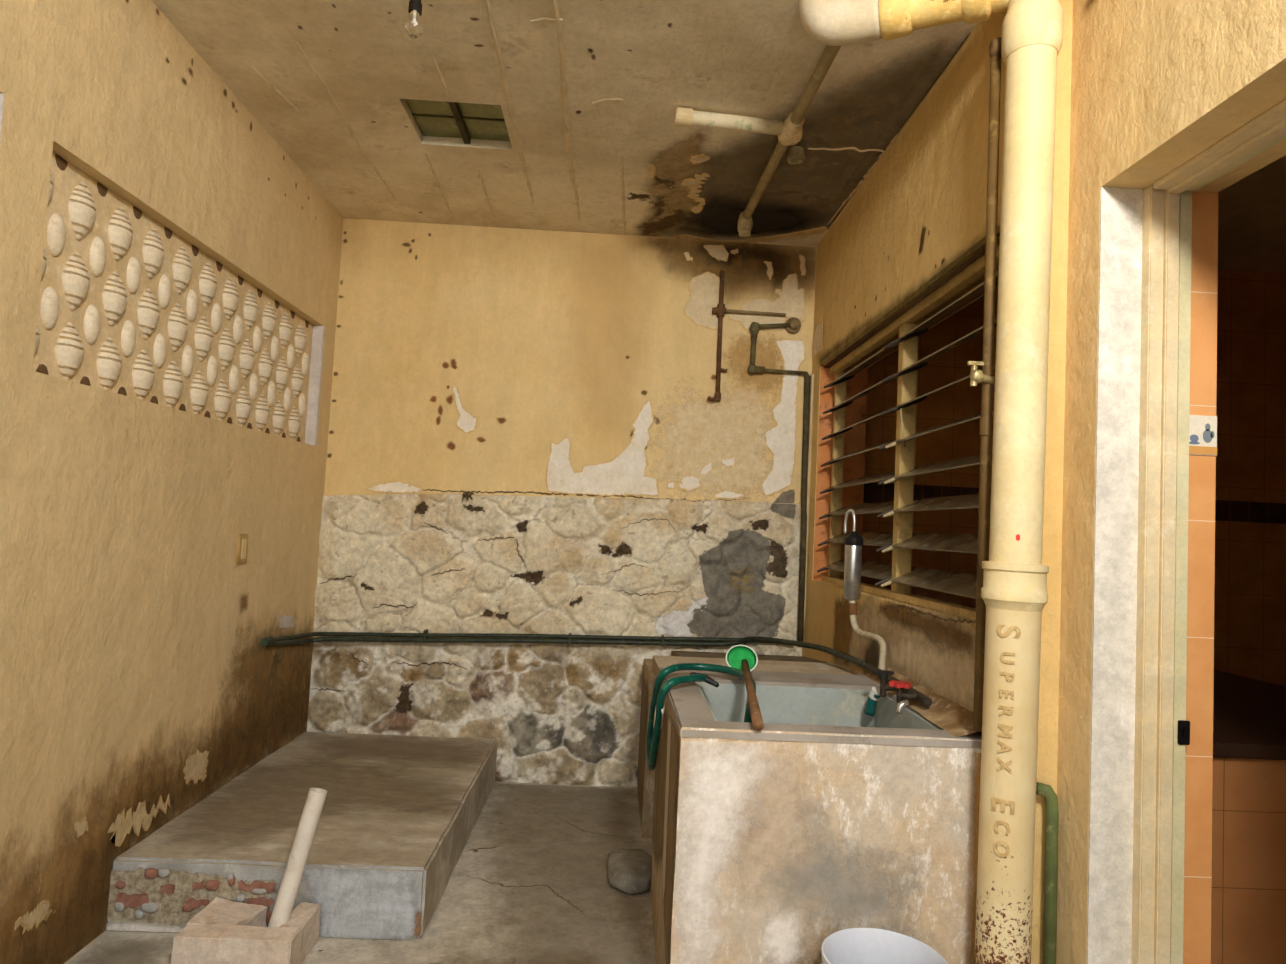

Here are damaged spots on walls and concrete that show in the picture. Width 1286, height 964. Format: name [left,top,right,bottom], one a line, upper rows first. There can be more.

peeling [545,132,827,500]
water stain [820,238,986,364]
crack [423,489,750,533]
crack [478,537,526,566]
crack [602,563,683,596]
crack [347,651,469,671]
peeling [183,750,209,785]
water stain [0,631,476,964]
peeling [74,815,88,838]
peeling [107,794,171,847]
peeling [15,900,56,934]